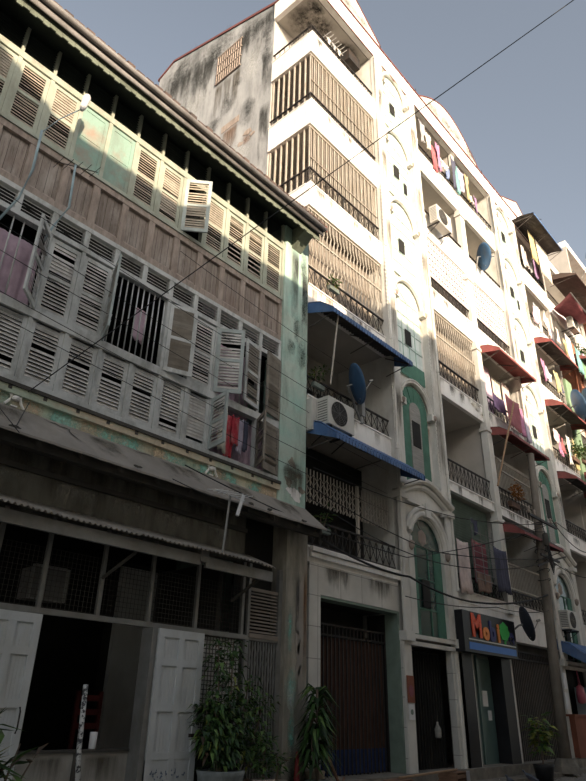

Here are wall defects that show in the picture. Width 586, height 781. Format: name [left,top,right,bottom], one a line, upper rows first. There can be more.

leakage [242,10,274,47]
leakage [293,3,352,53]
leakage [167,34,226,109]
leakage [259,110,267,131]
leakage [294,257,308,317]
peeling [285,457,305,503]